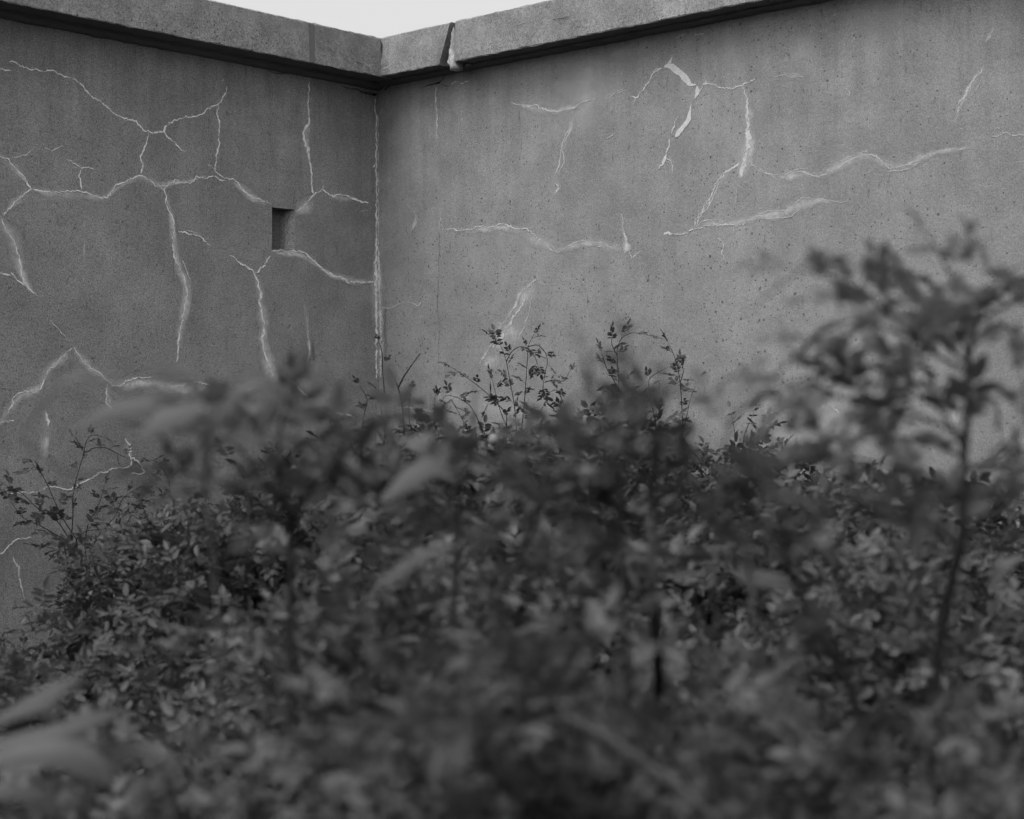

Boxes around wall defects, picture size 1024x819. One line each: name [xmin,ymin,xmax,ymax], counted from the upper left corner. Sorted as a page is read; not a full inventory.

crack [344,42,393,96]
crack [511,90,622,194]
spalling [631,57,703,172]
crack [663,68,983,260]
crack [0,61,374,423]
crack [439,215,639,258]
crack [10,439,140,494]